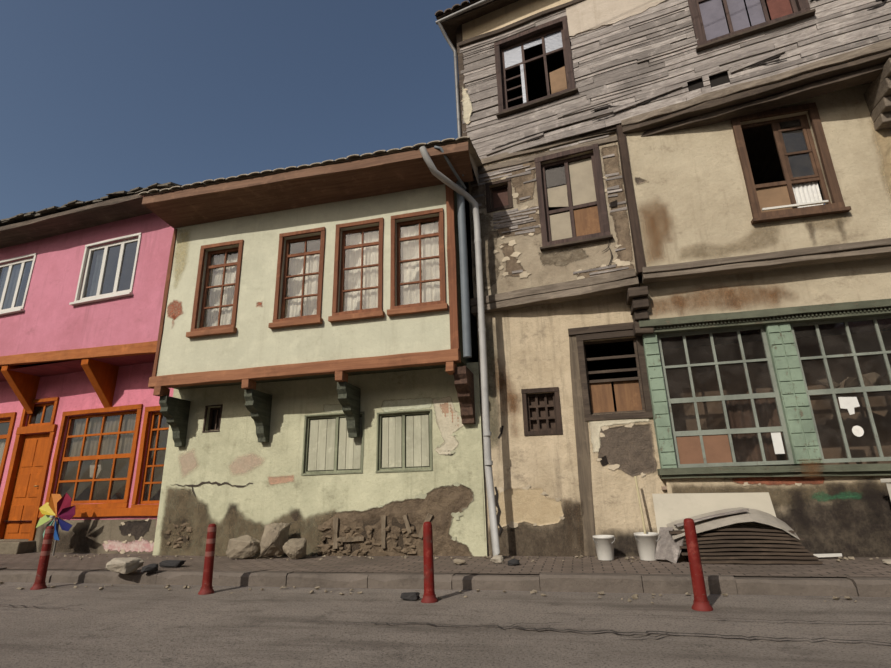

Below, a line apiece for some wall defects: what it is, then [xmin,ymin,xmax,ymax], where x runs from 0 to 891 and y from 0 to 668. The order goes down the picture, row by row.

peeling [470,134,634,291]
spalling [589,418,657,477]
crack [174,481,253,497]
peeling [496,485,565,528]
peeling [103,518,154,554]